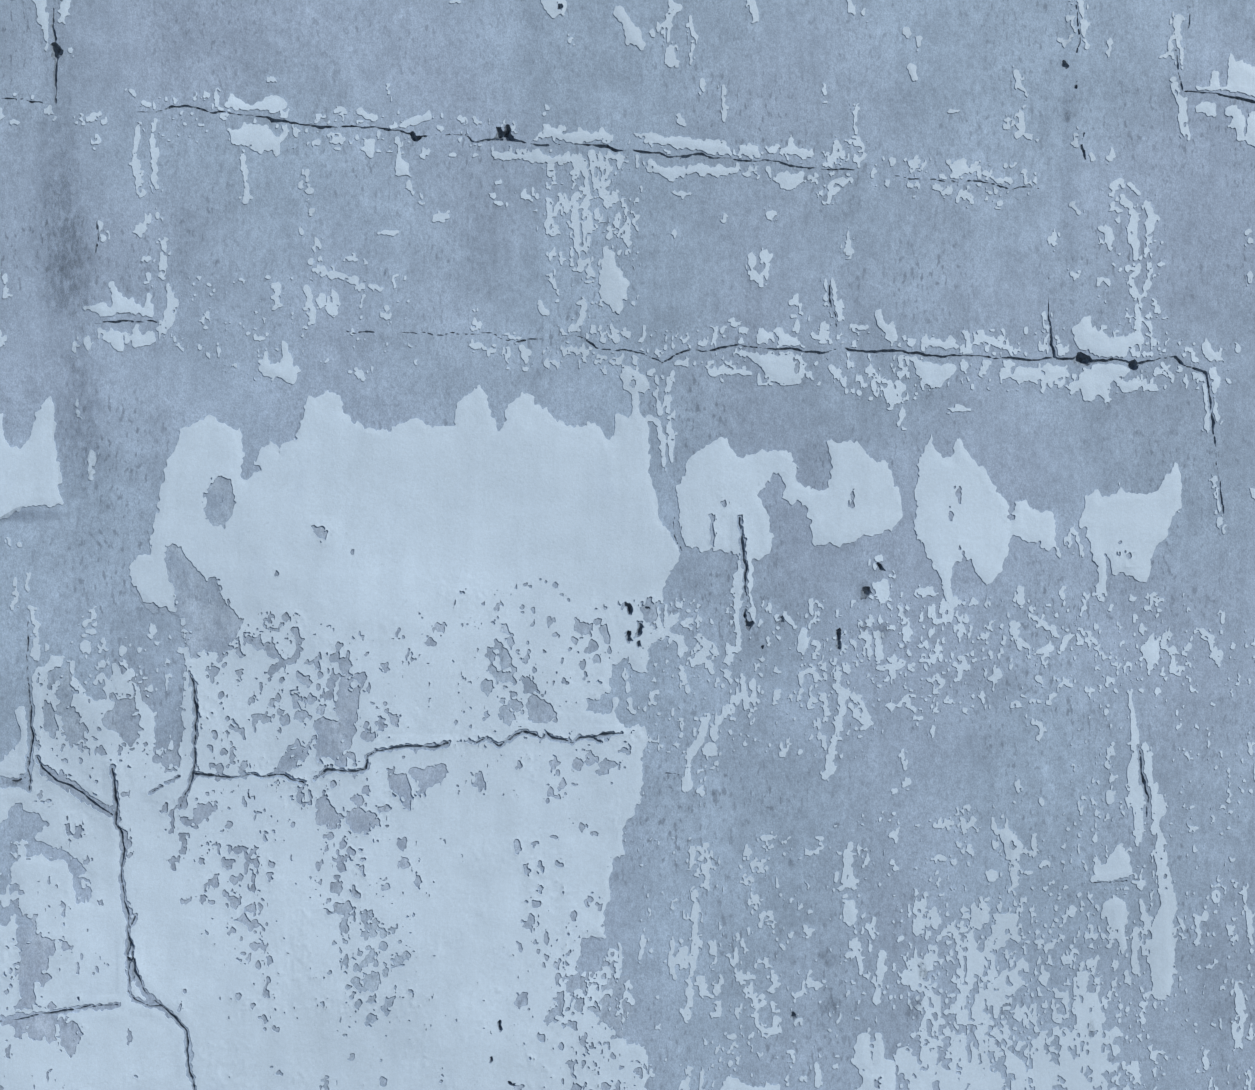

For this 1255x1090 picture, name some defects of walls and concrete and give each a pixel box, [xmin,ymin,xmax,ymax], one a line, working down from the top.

peeling [32,0,74,60]
peeling [1159,12,1255,147]
crack [1175,7,1255,104]
peeling [74,111,107,150]
crack [138,105,854,171]
peeling [1071,126,1116,164]
crack [577,277,1224,522]
peeling [0,396,64,519]
peeling [1209,475,1227,534]
crack [738,517,748,602]
crack [150,675,623,808]
crack [0,622,195,1090]